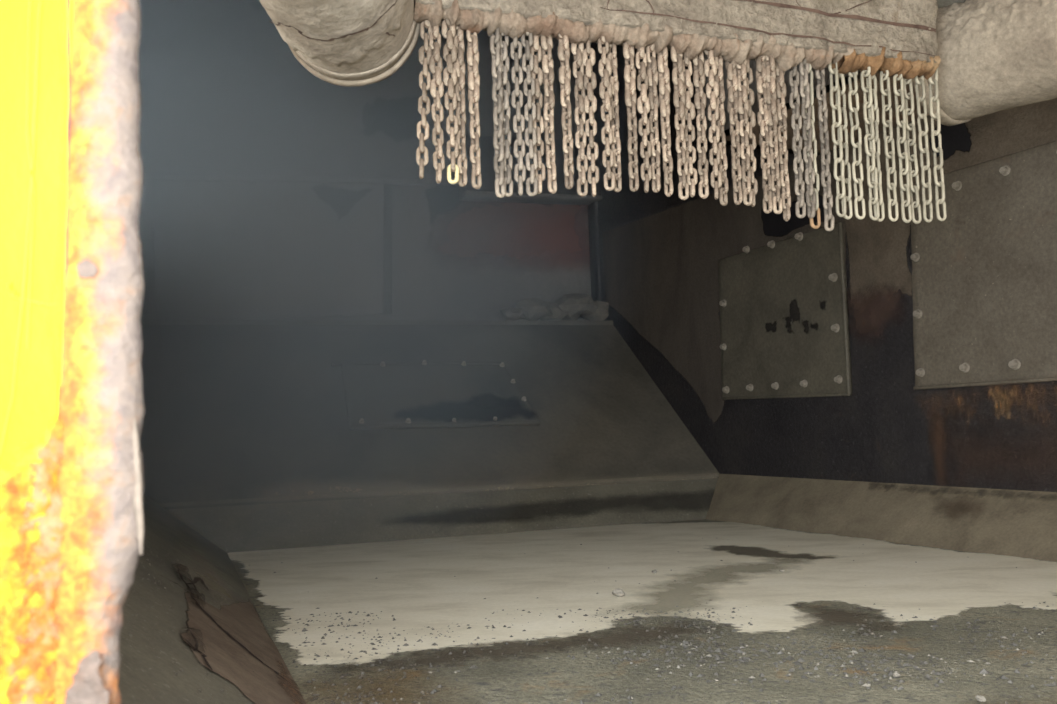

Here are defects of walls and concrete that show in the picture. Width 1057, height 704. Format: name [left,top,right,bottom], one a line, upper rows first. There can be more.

crack [264,1,397,41]
crack [600,0,936,56]
corrosion [0,419,67,704]
damp [630,546,833,613]
crack [161,565,296,687]
damp [335,624,697,672]
damp [804,606,890,630]